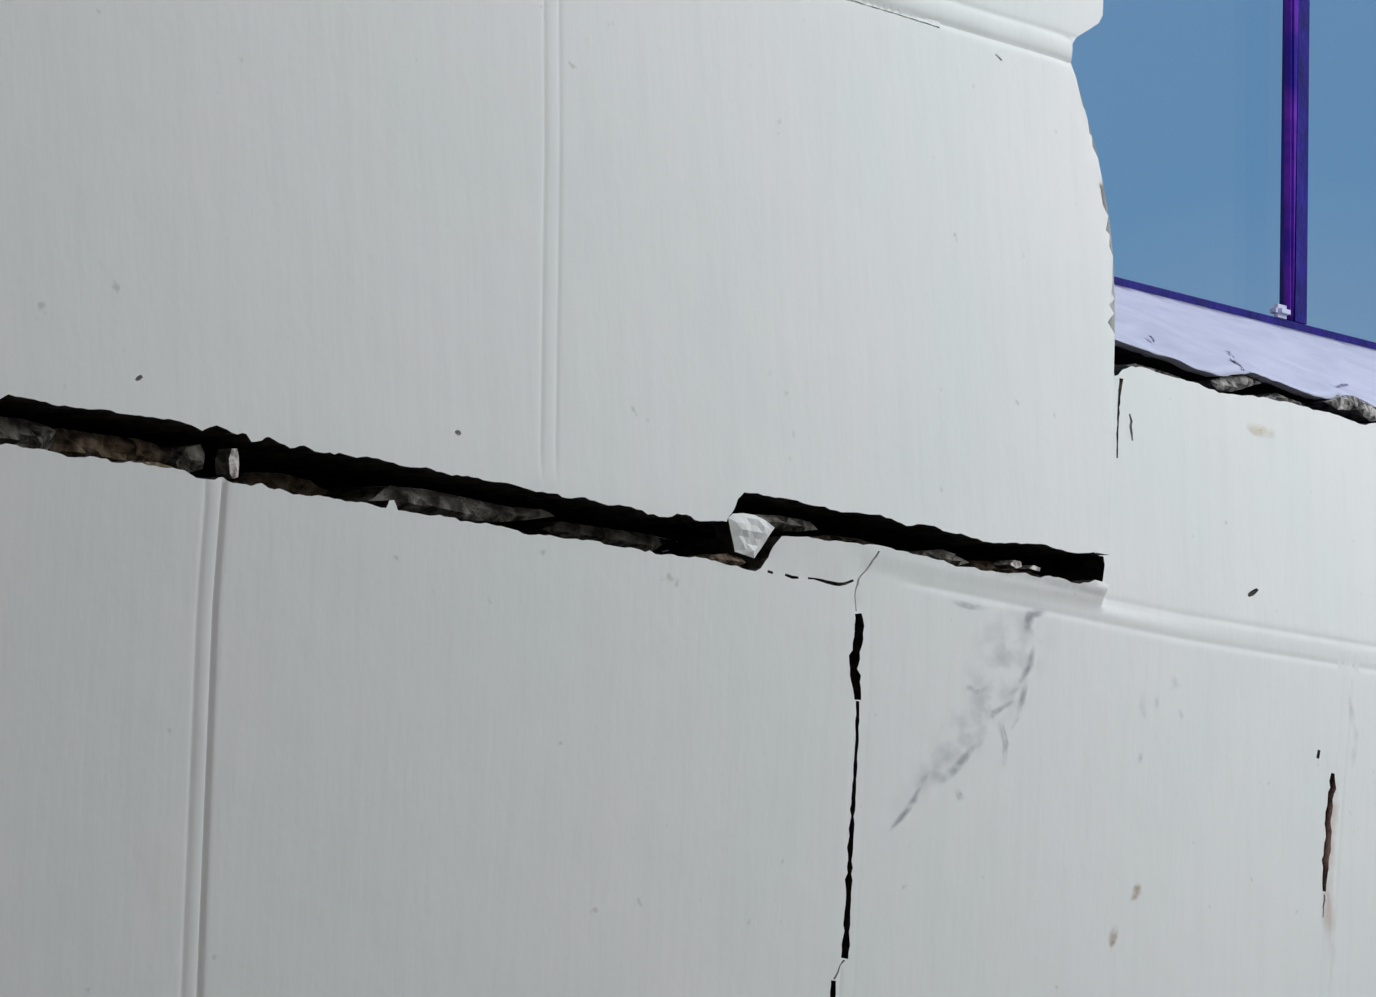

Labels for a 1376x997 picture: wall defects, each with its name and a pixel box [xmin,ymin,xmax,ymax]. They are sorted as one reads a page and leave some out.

crack [1114,336,1376,458]
crack [0,394,1105,997]
crack [1316,750,1336,917]